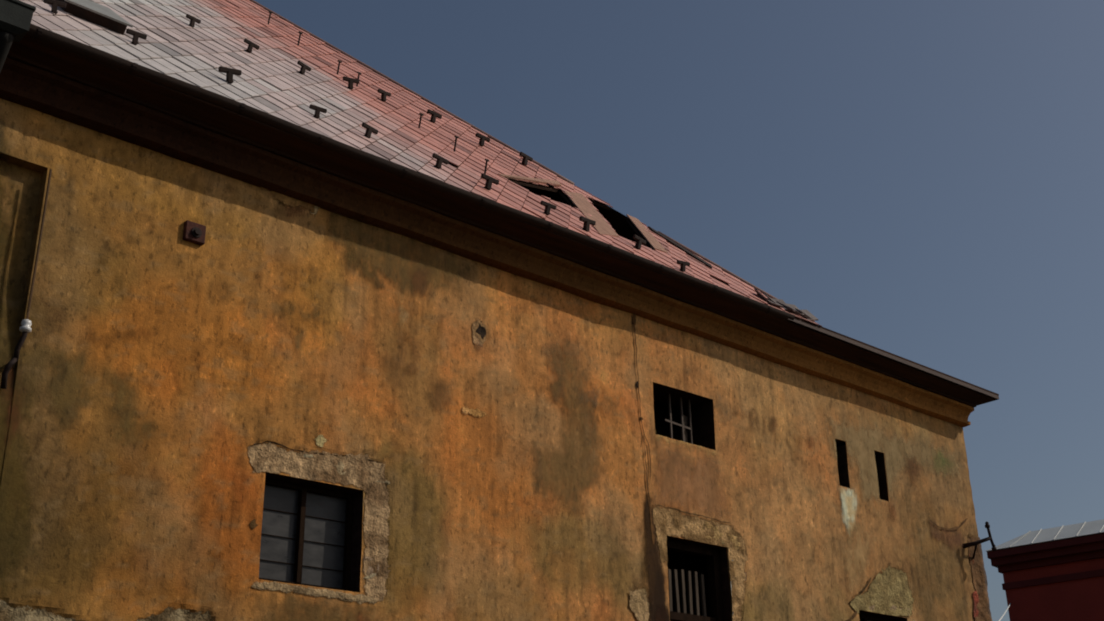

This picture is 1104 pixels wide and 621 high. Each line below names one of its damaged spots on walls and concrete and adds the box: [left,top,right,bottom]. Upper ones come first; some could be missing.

water stain [535,339,613,511]
crack [632,314,655,544]
spalling [0,600,82,621]
spalling [137,607,212,621]
flaking render [248,435,391,605]
spalling [630,589,650,621]
flaking render [653,505,748,621]
spalling [849,565,915,621]